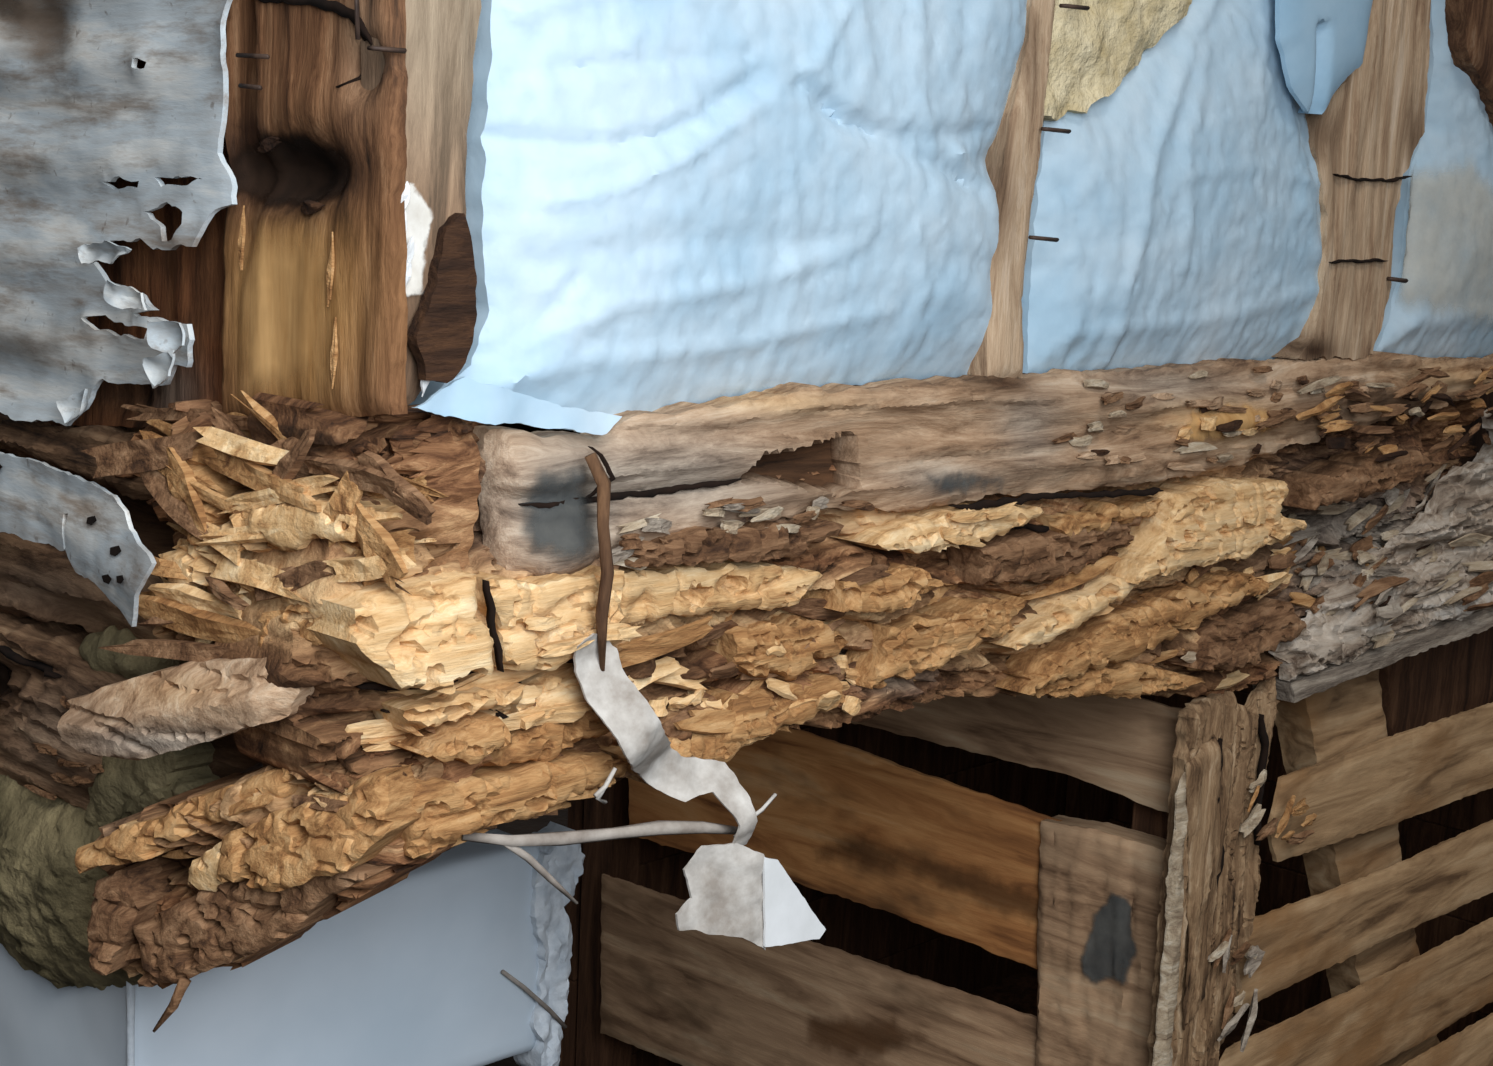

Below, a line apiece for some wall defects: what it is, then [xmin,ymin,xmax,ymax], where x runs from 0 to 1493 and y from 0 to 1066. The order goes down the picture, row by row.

peeling [77,240,188,388]
peeling [56,389,88,423]
crack [355,682,419,713]
crack [454,580,522,748]
crack [1217,714,1269,886]
leakage [1082,894,1136,984]